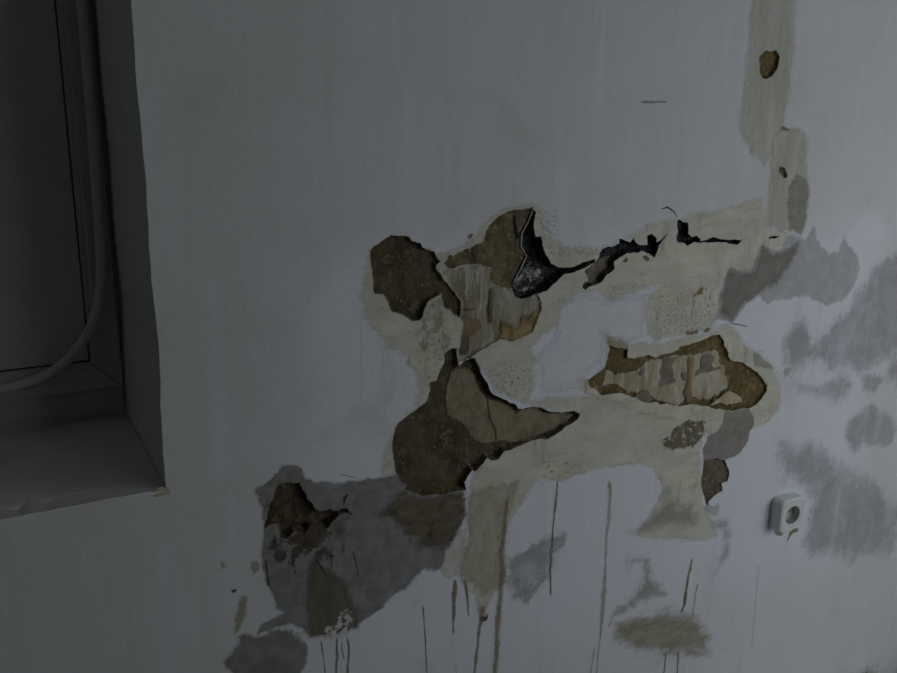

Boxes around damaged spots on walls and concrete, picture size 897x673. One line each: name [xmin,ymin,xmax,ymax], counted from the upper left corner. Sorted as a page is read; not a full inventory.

flaking render [759,50,780,79]
crack [509,206,742,297]
flaking render [370,207,580,496]
flaking render [588,328,773,411]
flaking render [264,482,352,539]
flaking render [701,458,729,505]
water stain [786,447,897,550]
water stain [226,465,465,673]
peeling [439,528,468,579]
water stain [510,536,566,601]
peeling [321,609,353,639]